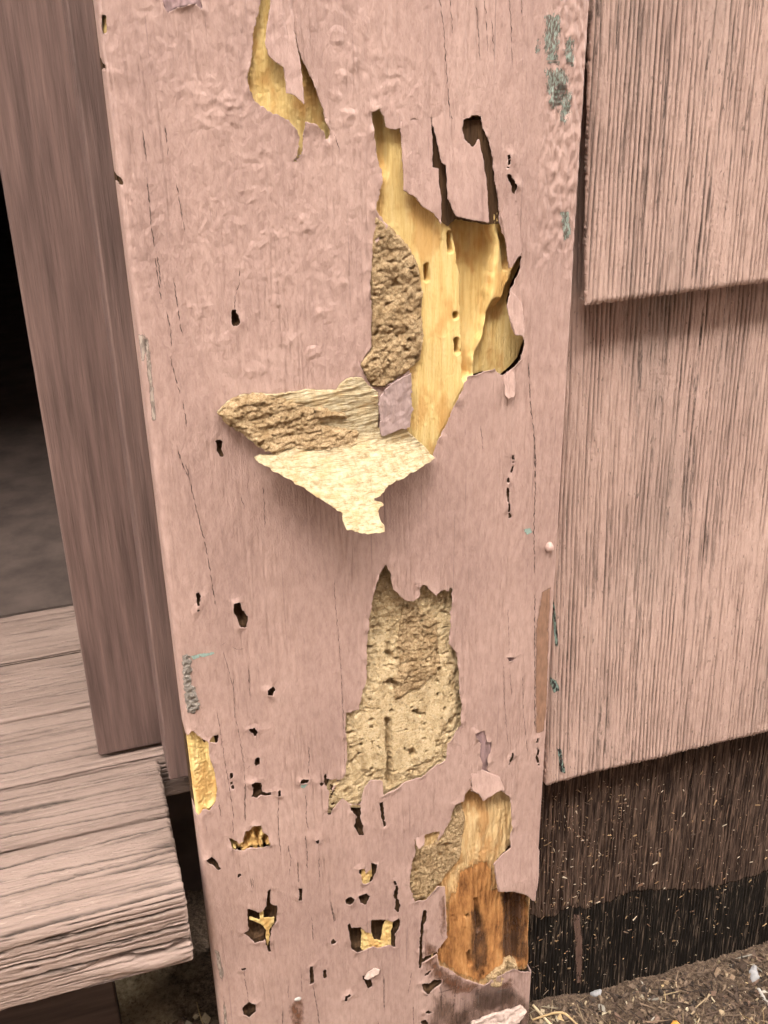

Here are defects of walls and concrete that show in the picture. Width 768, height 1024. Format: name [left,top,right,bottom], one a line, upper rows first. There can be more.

peeling [247,0,330,162]
spalling [360,109,525,456]
spalling [327,565,462,813]
peeling [186,731,217,815]
peeling [229,826,270,850]
spalling [410,731,540,994]
peeling [470,1005,527,1024]